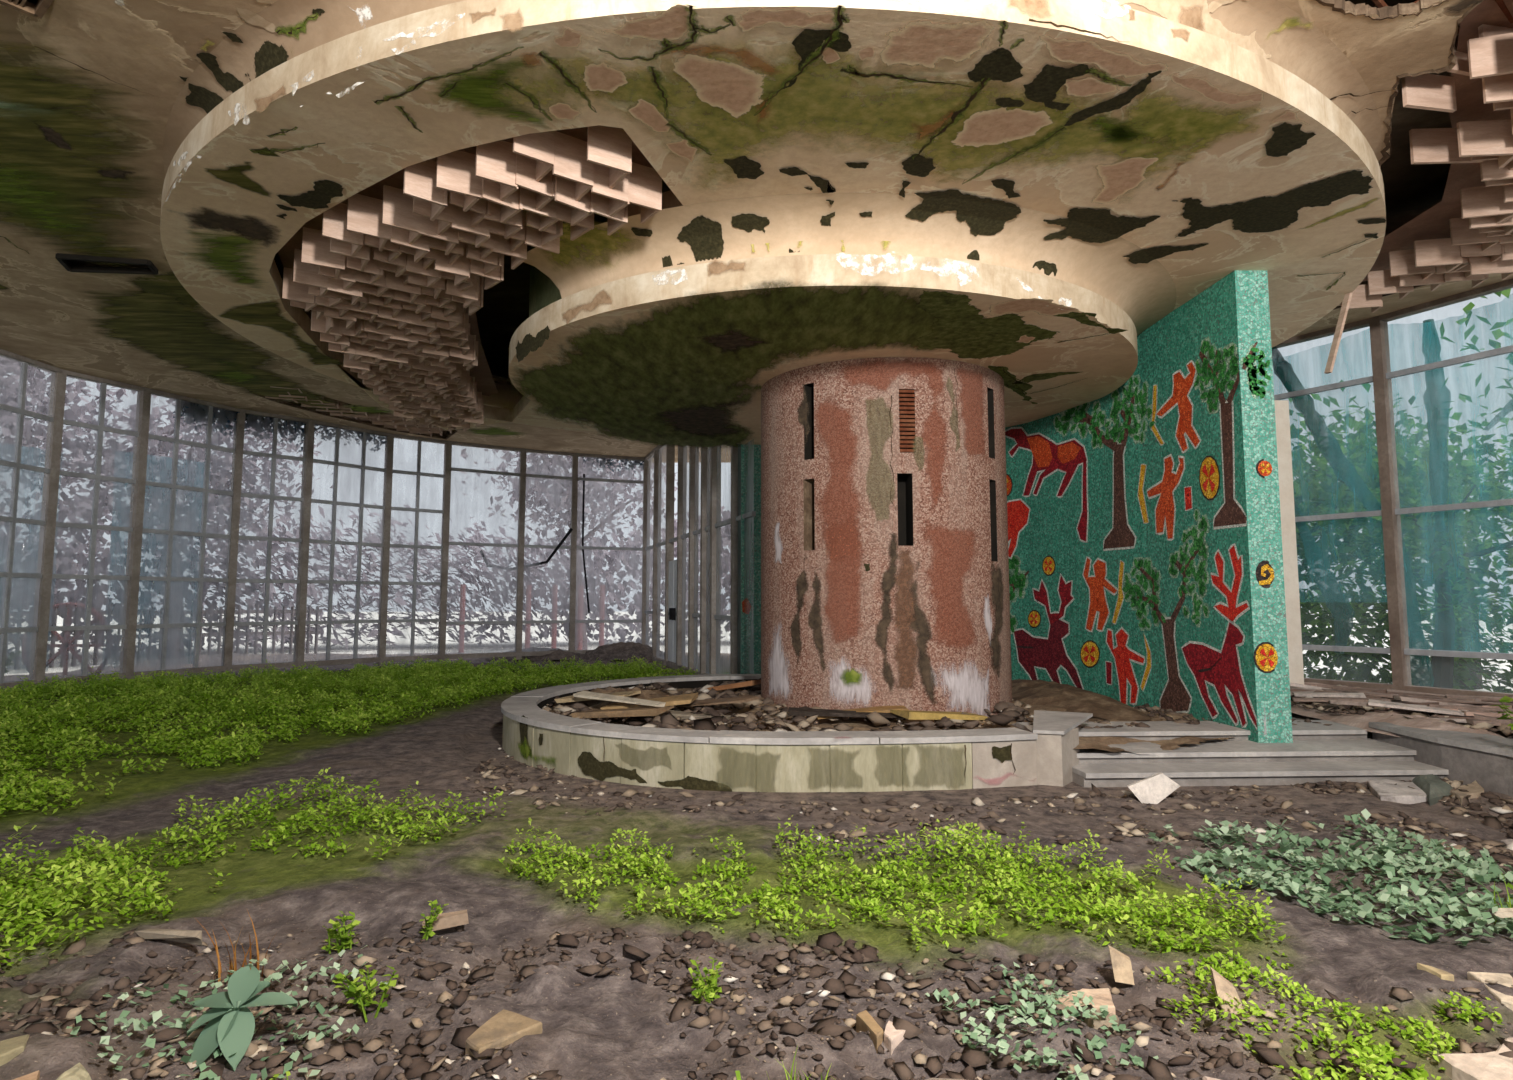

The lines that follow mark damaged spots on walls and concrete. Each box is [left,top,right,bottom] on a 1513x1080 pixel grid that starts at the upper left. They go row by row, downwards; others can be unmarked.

leakage [471,9,522,31]
peeling [1100,0,1272,59]
leakage [255,86,285,112]
spalling [1123,0,1481,264]
spalling [1043,157,1160,243]
leakage [708,243,769,275]
leakage [563,291,612,324]
leakage [798,384,810,443]
leakage [770,534,1003,715]